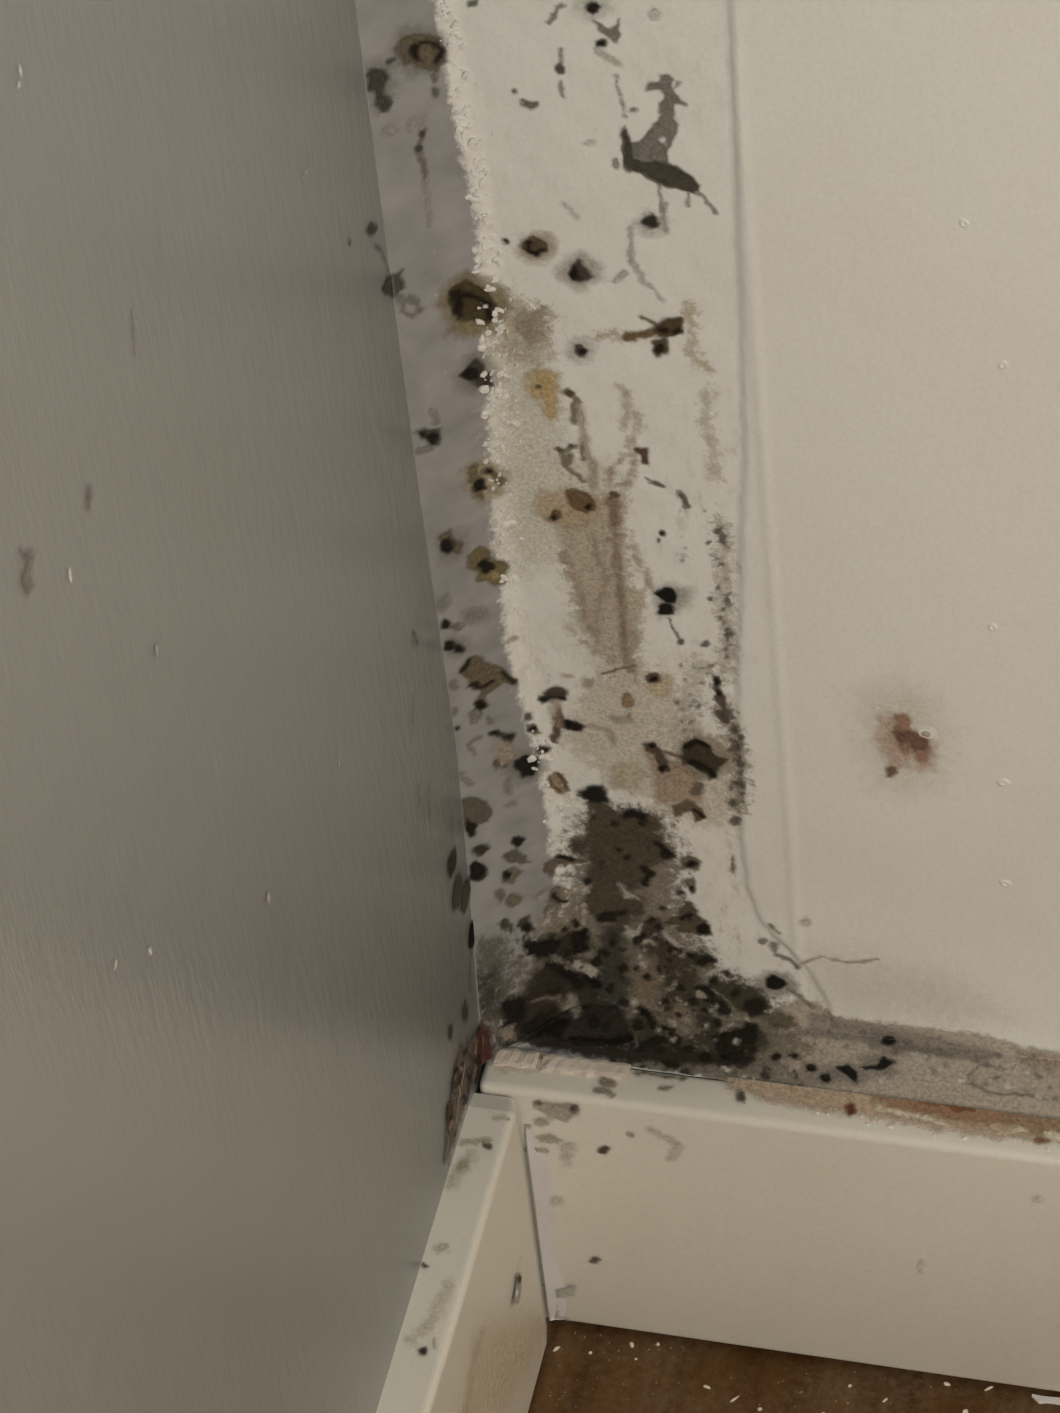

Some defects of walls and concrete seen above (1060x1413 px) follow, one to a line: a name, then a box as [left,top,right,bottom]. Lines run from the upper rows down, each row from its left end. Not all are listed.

leakage [367,35,445,112]
peeling [613,75,717,214]
leakage [368,223,422,318]
peeling [440,0,524,614]
leakage [503,236,555,259]
leakage [561,255,599,286]
leakage [640,215,663,233]
leakage [417,416,440,454]
peeling [556,389,596,489]
leakage [438,273,1060,1120]
peeling [527,730,574,842]
rust [878,715,932,777]